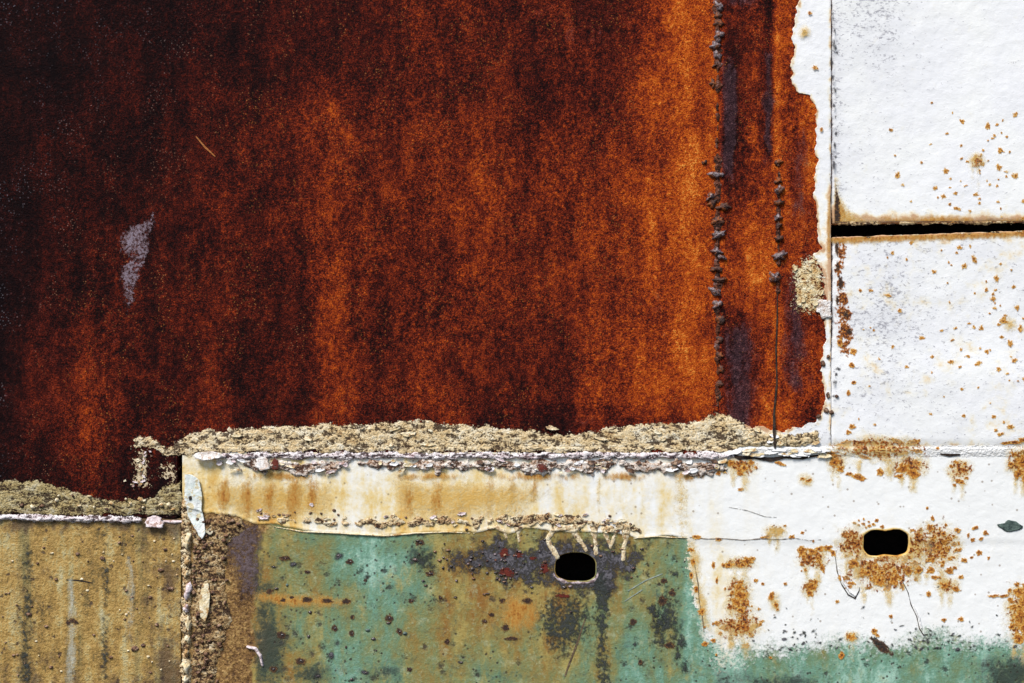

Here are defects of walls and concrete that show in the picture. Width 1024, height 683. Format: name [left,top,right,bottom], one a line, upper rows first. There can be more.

rust [960,112,1018,188]
peeling [792,255,833,319]
peeling [0,413,832,539]
rust [716,459,758,491]
rust [827,418,940,489]
rust [947,460,972,489]
rust [990,403,1024,489]
rust [760,507,990,618]
rust [647,535,787,671]
rust [988,582,1024,657]